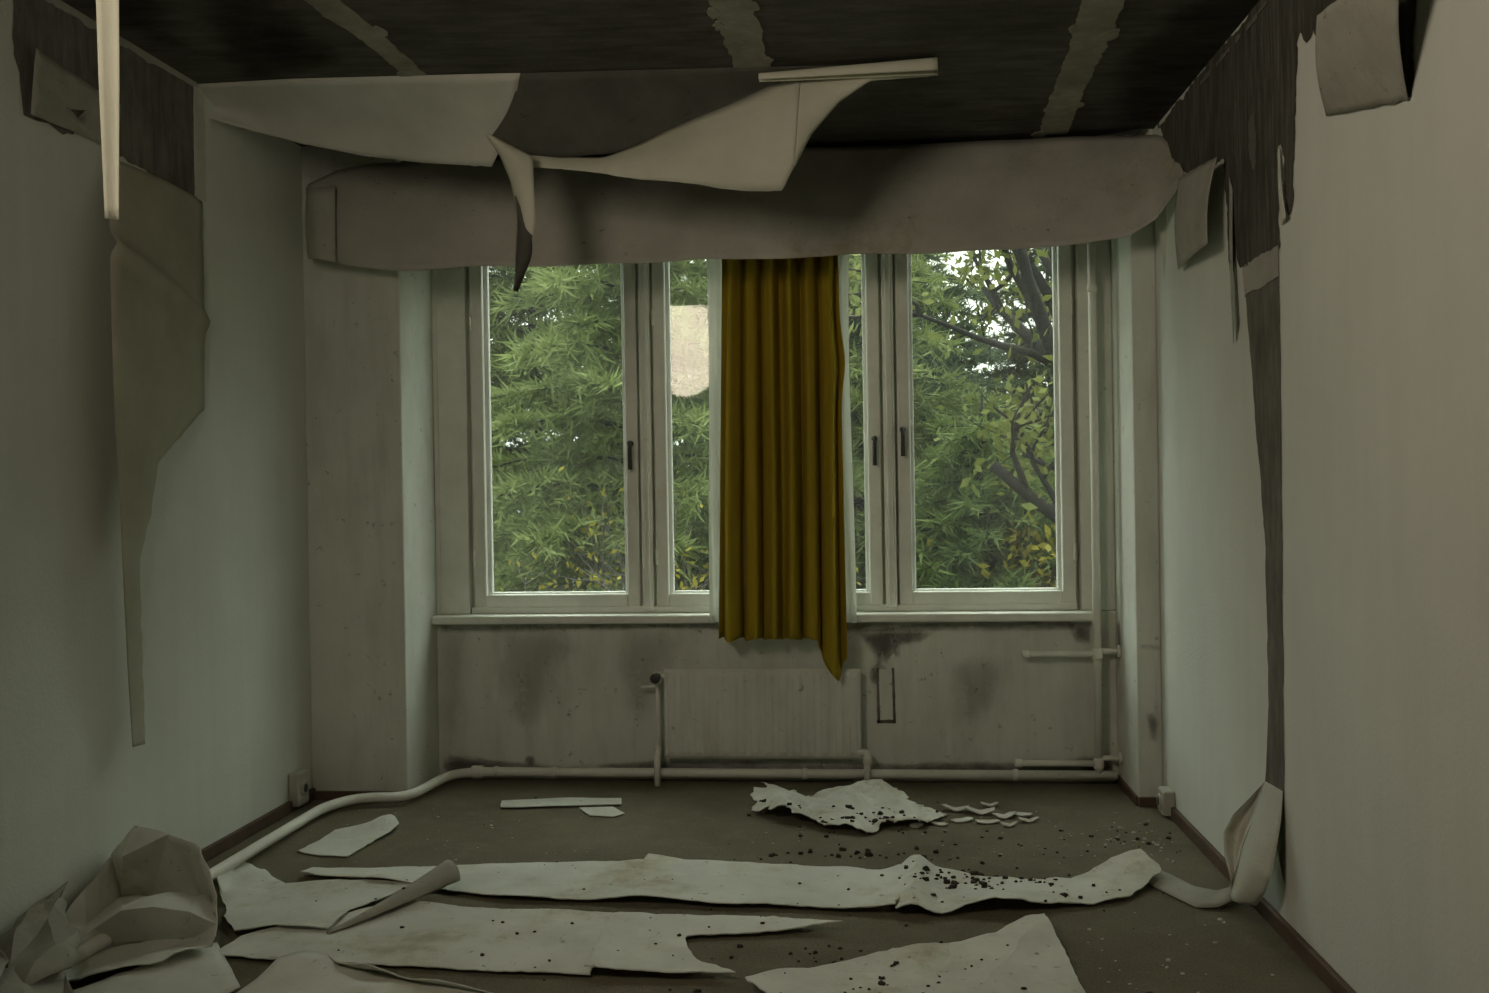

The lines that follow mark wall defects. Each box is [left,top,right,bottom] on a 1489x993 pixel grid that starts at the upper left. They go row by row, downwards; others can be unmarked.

flaking render [1158,0,1337,881]
flaking render [1399,0,1416,98]